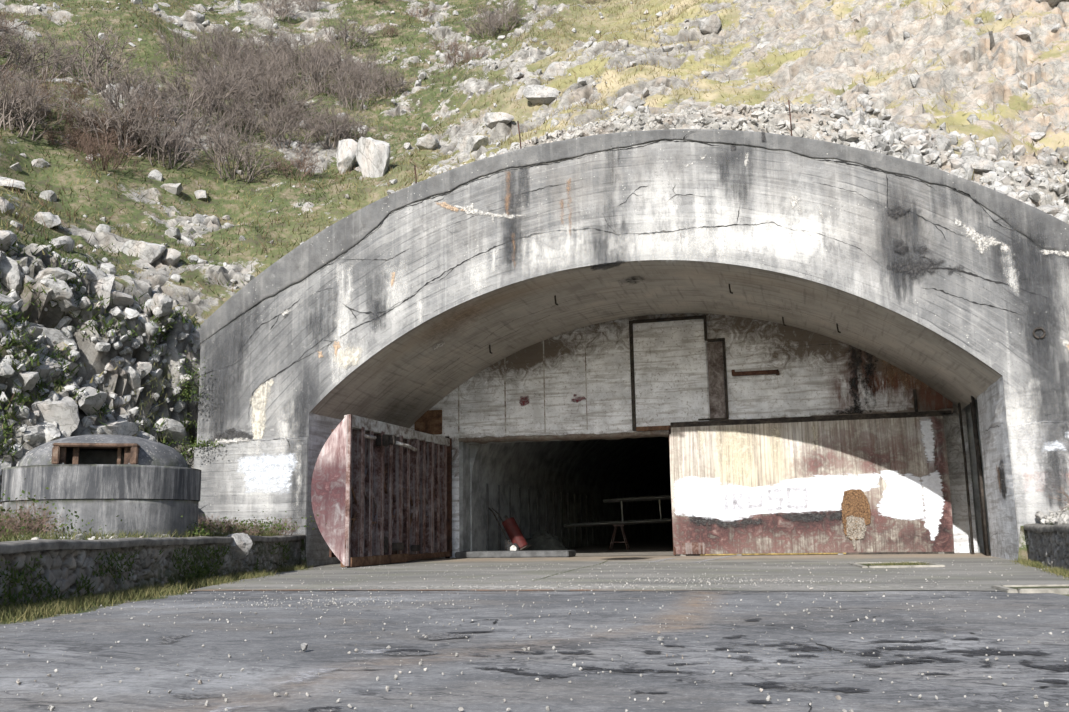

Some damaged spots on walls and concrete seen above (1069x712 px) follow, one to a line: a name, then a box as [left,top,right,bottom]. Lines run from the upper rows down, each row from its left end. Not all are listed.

crack [202,131,1051,447]
rust [848,345,877,412]
spalling [203,380,273,445]